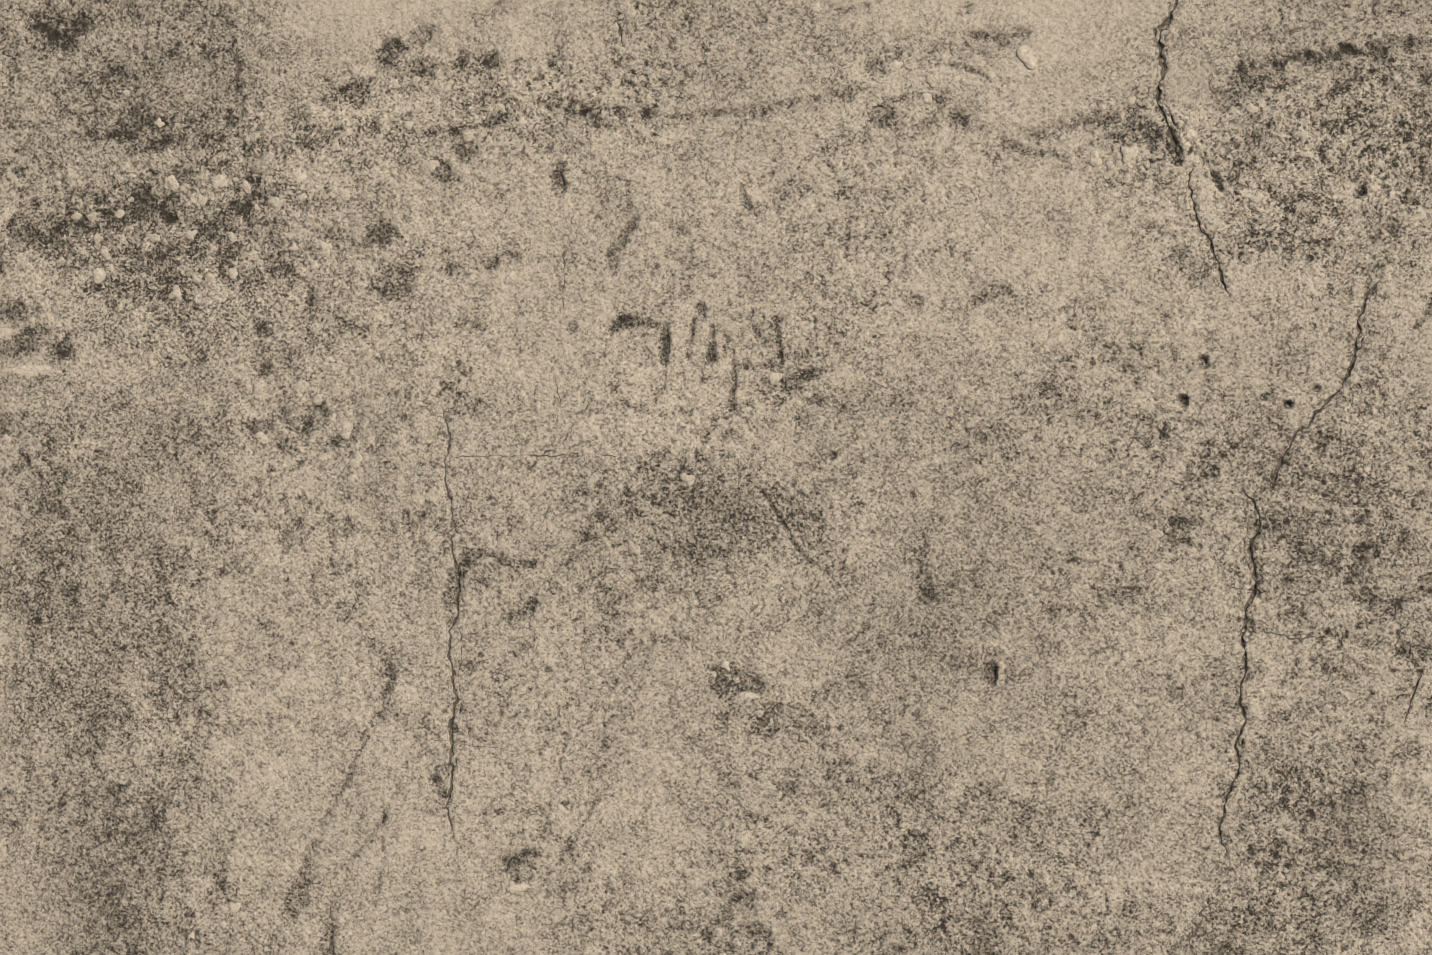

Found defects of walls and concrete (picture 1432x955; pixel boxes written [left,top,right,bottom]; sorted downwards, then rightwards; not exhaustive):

crack [562,214,574,310]
crack [1152,0,1232,296]
crack [393,368,629,888]
crack [1189,277,1393,952]